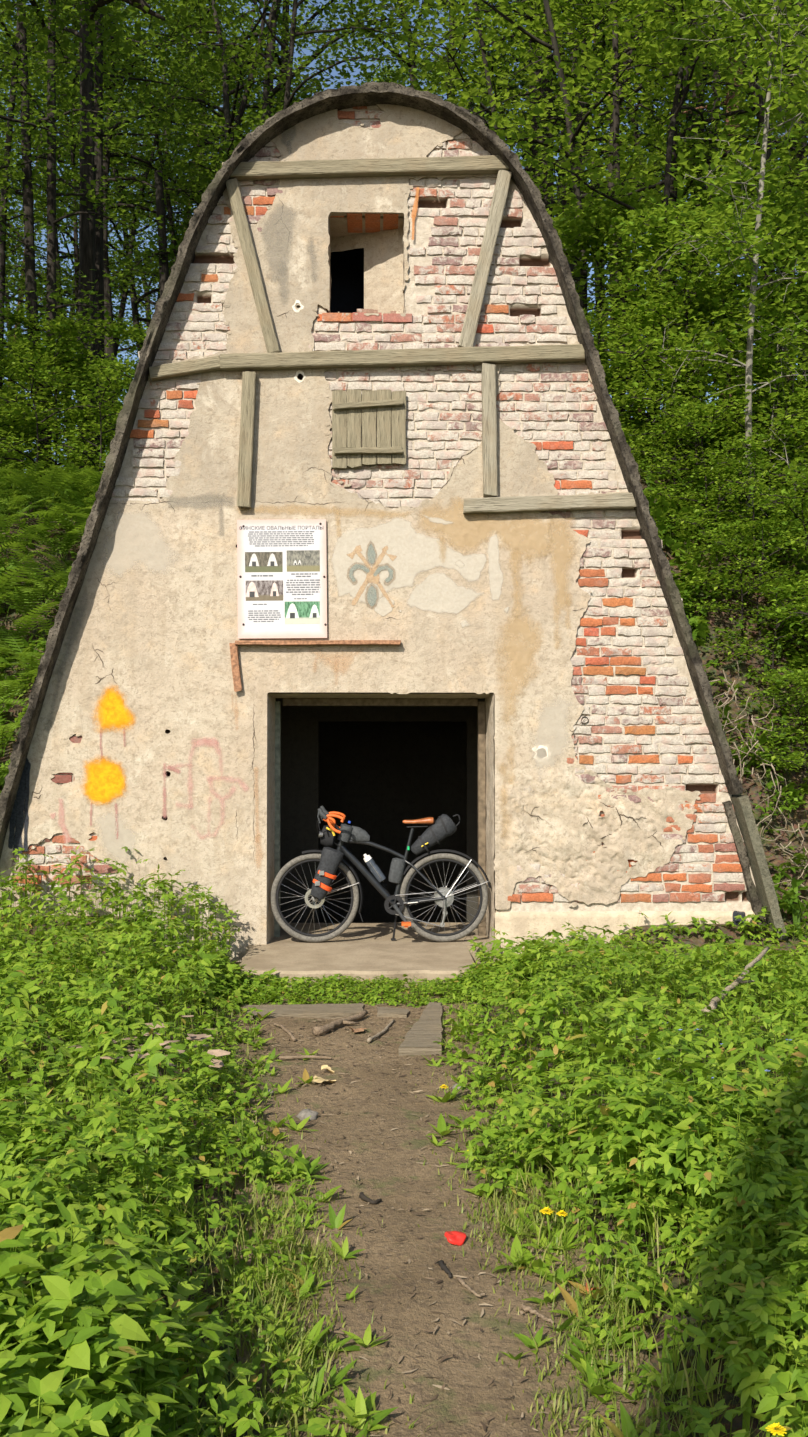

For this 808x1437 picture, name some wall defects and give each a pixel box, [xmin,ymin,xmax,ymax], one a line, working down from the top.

spalling [248,141,285,162]
spalling [428,132,490,157]
spalling [292,174,576,351]
spalling [106,179,283,574]
leakage [422,501,571,713]
spalling [324,361,745,907]
spalling [12,815,135,894]